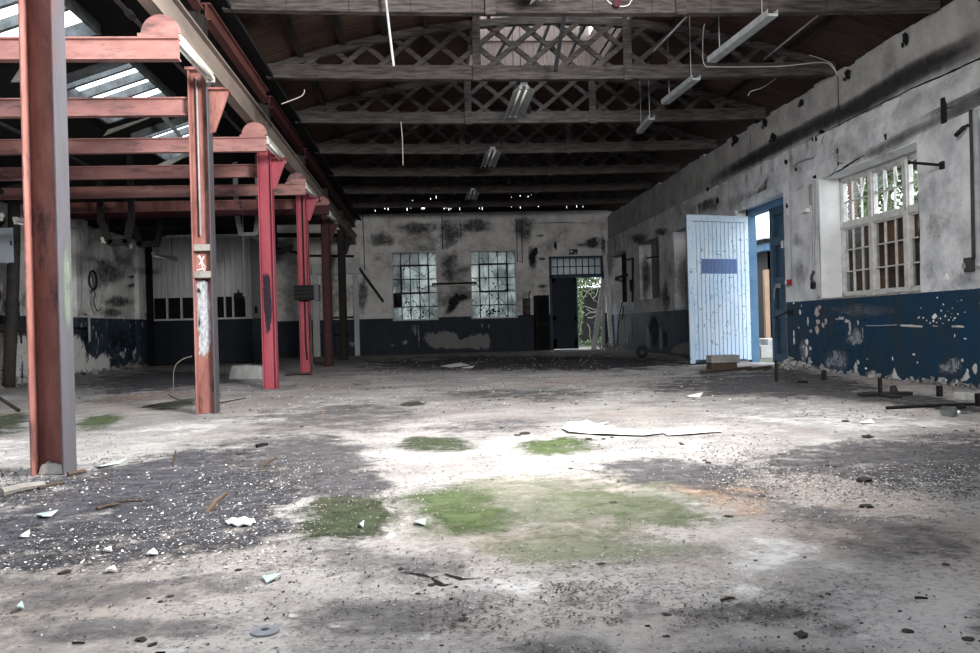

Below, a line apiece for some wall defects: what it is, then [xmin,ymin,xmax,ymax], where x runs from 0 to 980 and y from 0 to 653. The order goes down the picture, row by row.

water stain [371,234,394,245]
water stain [400,219,489,247]
water stain [515,218,545,260]
water stain [105,275,134,317]
water stain [394,266,403,299]
peeling [793,302,859,363]
peeling [16,332,28,380]
flaking render [931,359,977,385]